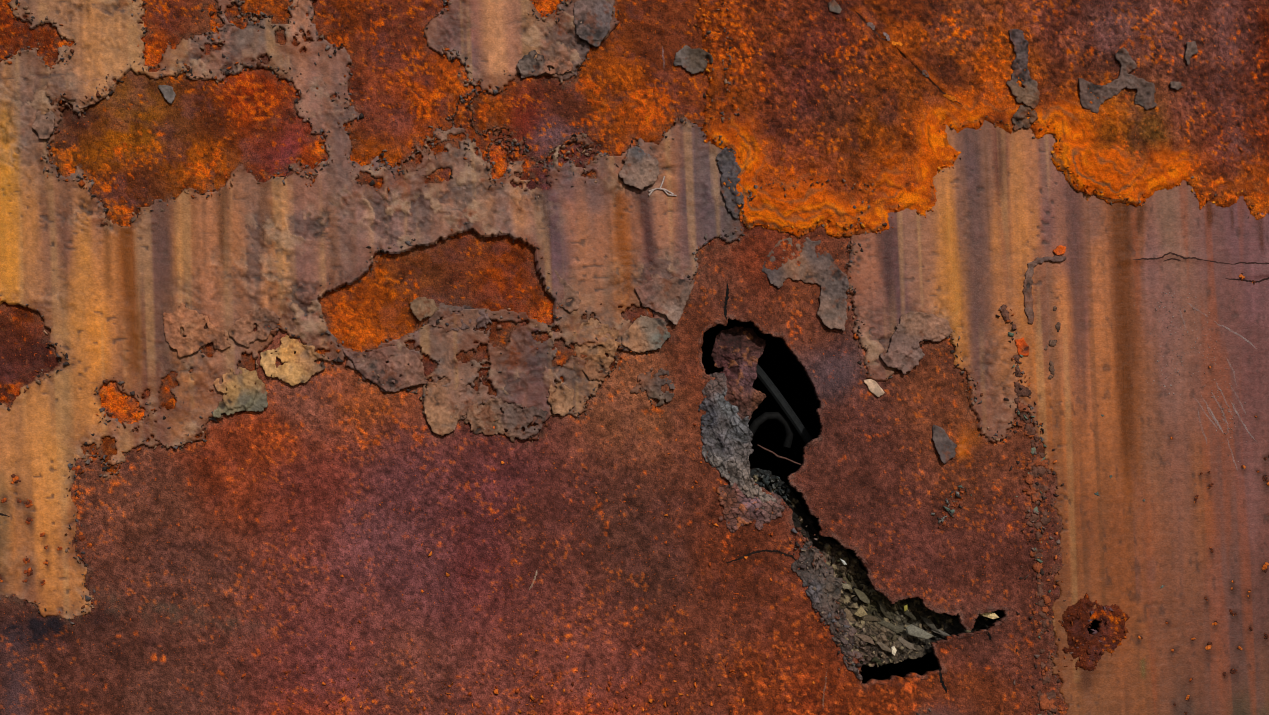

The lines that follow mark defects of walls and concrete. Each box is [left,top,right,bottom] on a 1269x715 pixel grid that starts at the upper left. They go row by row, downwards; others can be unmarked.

corrosion [355,171,383,191]
corrosion [94,371,184,432]
peeling [163,303,326,418]
peeling [344,346,575,442]
peeling [554,269,695,381]
corrosion [618,304,653,324]
corrosion [711,326,766,420]
peeling [762,237,849,331]
crack [1133,252,1269,283]
peeling [698,372,785,533]
crack [724,549,796,564]
crack [939,668,947,693]